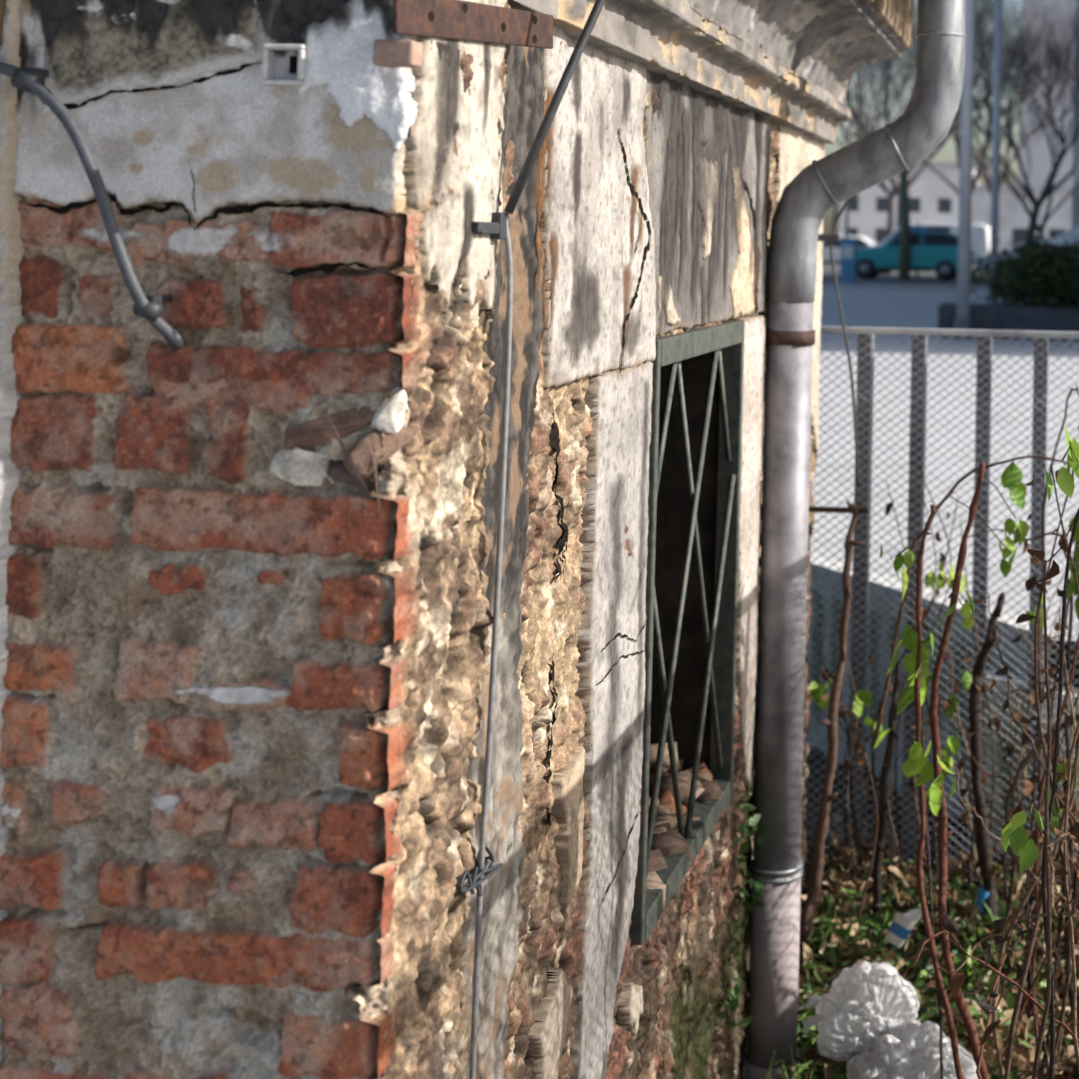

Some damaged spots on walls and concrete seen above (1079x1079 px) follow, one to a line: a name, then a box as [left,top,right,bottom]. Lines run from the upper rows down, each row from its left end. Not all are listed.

damp [19,0,393,69]
rust [373,0,553,68]
crack [20,159,391,230]
damp [574,134,582,212]
damp [566,243,599,363]
crack [619,128,651,373]
damp [651,71,769,331]
spalling [13,0,825,1079]